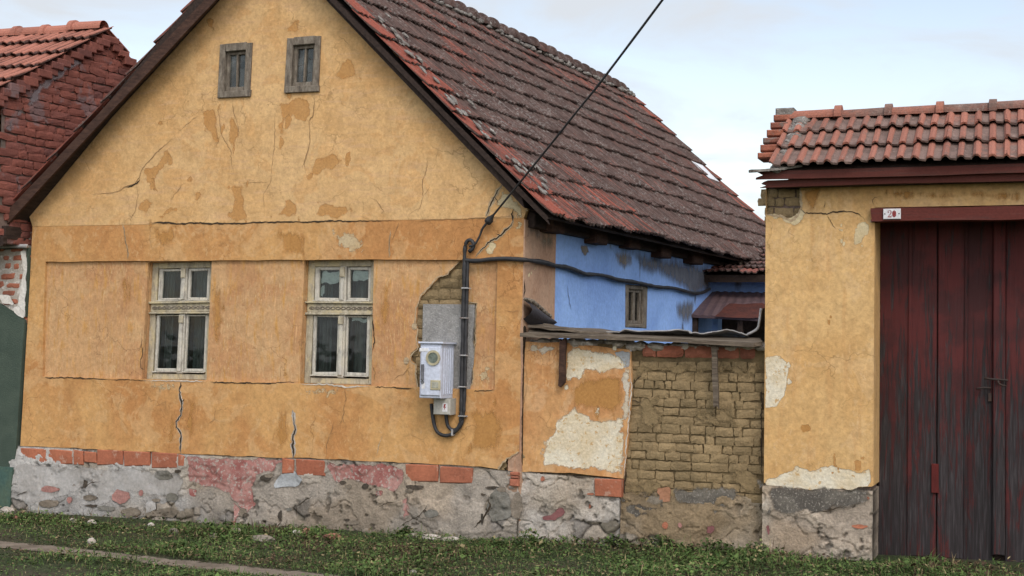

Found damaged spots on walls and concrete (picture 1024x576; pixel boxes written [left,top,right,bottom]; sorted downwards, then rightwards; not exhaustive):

peeling [203,105,238,150]
peeling [279,93,310,149]
crack [101,104,519,258]
peeling [317,202,362,252]
crack [804,197,877,227]
flaking render [0,248,31,323]
flaking render [404,261,477,387]
flaking render [765,356,792,408]
crack [157,383,184,452]
crack [289,410,297,458]
flaking render [481,345,632,525]
flaking render [765,453,871,490]